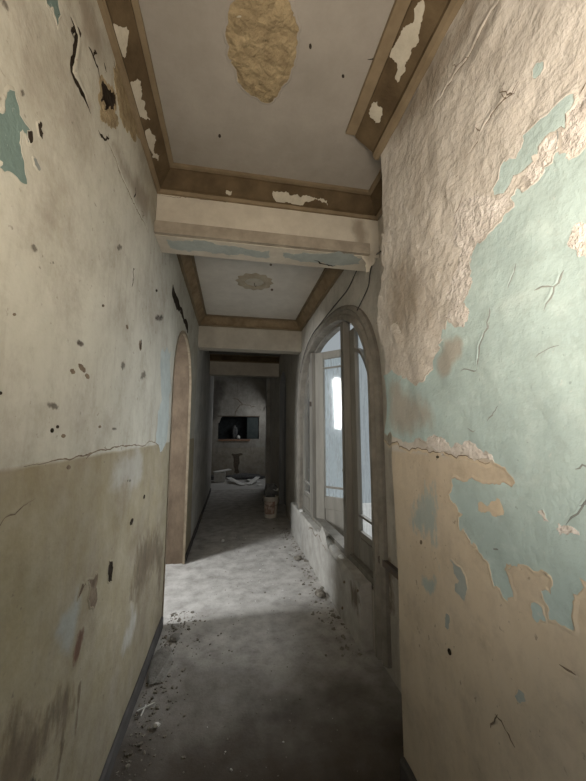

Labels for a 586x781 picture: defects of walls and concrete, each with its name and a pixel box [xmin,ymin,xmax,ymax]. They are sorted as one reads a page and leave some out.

peeling [45,0,62,30]
peeling [390,0,425,82]
crack [57,7,116,141]
peeling [0,84,43,188]
peeling [272,191,328,205]
crack [461,308,490,372]
peeling [400,88,586,637]
crack [24,441,158,467]
crack [566,492,586,524]